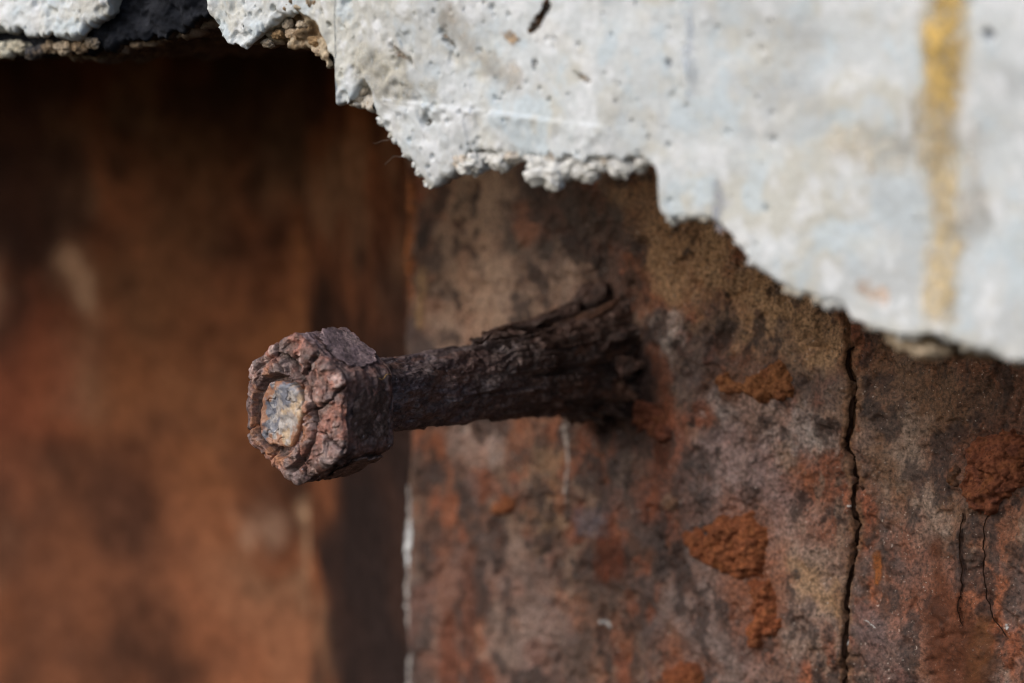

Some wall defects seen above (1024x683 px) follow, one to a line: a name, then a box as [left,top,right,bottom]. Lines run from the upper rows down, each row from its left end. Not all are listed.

spalling [452,150,652,192]
peeling [468,280,646,382]
spalling [783,286,1022,365]
corrosion [594,344,661,437]
corrosion [707,359,794,404]
crack [838,346,865,683]
corrosion [946,428,1024,516]
corrosion [681,510,782,648]
crack [957,513,1007,637]
corrosion [661,660,705,683]